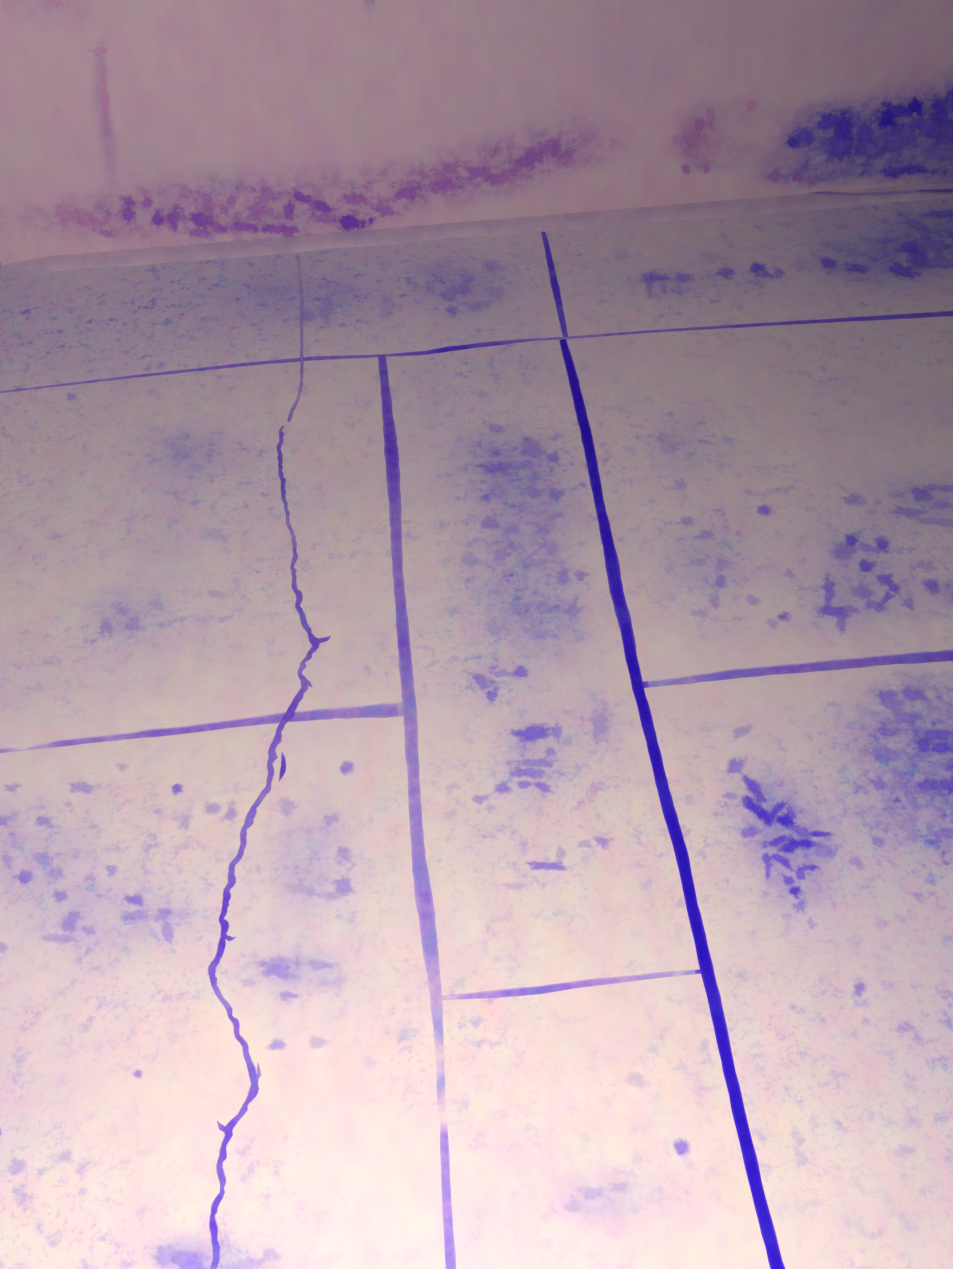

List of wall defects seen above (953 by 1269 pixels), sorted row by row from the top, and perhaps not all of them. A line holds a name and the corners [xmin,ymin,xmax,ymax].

water stain [769,91,953,185]
water stain [123,140,572,237]
crack [208,254,331,1269]